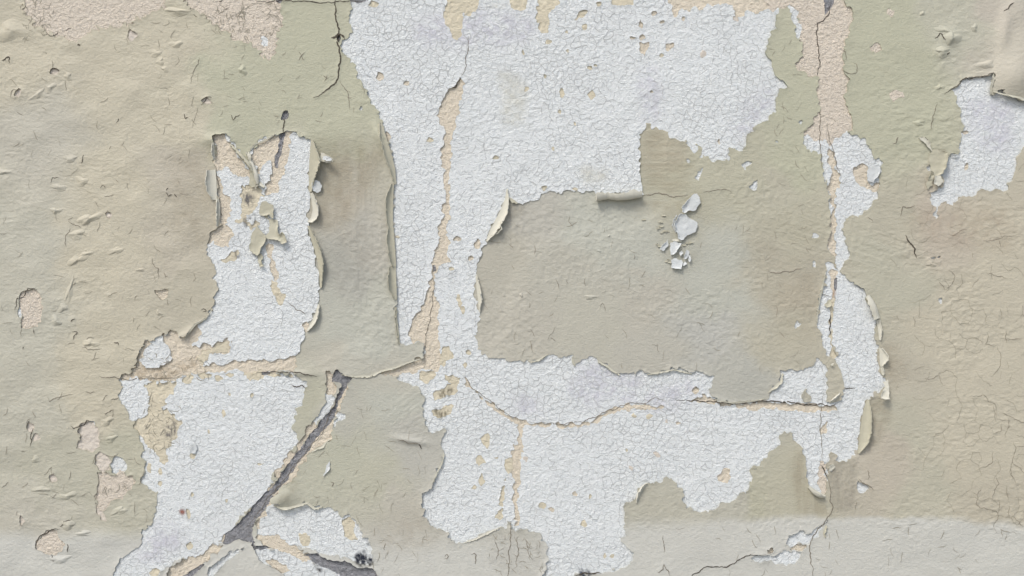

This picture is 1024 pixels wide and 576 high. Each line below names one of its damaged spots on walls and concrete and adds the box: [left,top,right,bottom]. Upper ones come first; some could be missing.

peeling [76,421,127,474]
crack [114,0,365,204]
peeling [113,111,377,576]
peeling [336,0,890,576]
crack [466,378,873,576]
crack [765,102,841,363]
crack [890,165,1024,573]
peeling [919,73,1024,219]